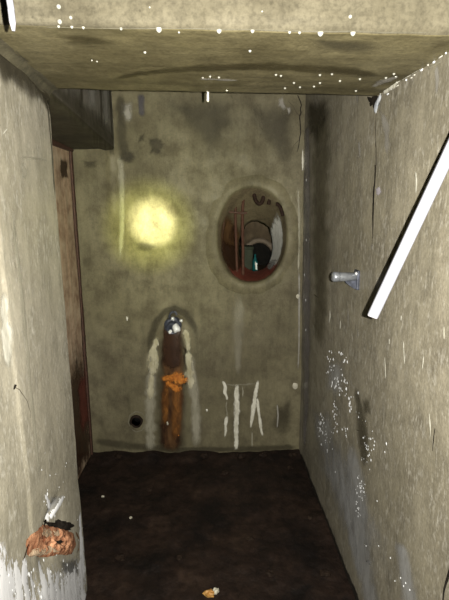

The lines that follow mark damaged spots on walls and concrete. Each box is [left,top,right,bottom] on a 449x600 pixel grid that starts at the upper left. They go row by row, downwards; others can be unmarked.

crack [288,95,302,154]
crack [371,123,381,249]
rust [148,307,196,345]
leakage [302,103,326,444]
rust [161,329,188,449]
leakage [100,330,292,452]
peeling [0,489,87,600]
leakage [300,394,375,600]
leakage [398,546,413,600]